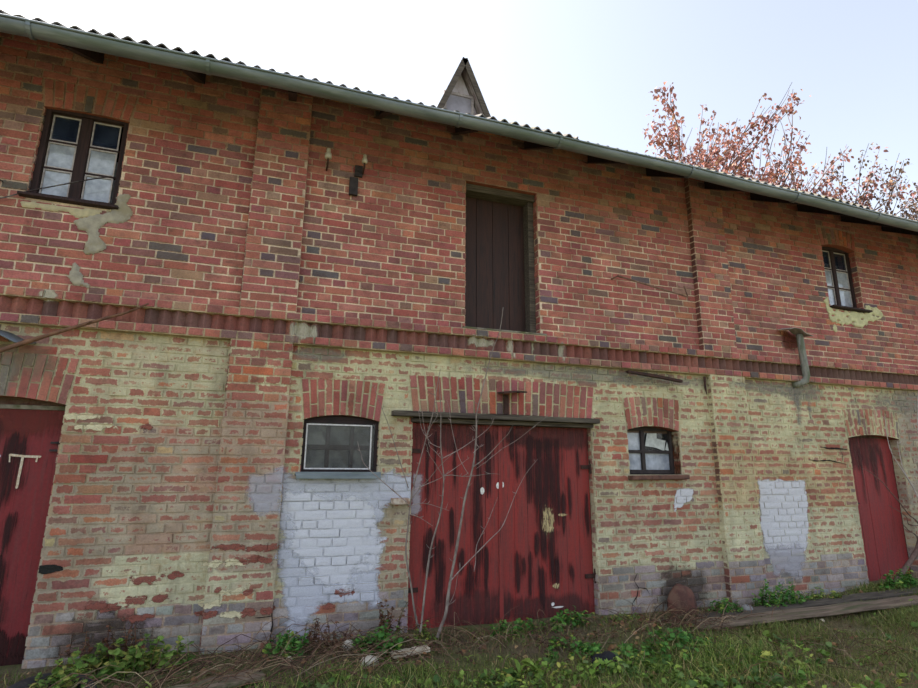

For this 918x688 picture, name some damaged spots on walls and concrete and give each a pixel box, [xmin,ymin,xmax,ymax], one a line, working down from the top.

spalling [323,588,355,610]